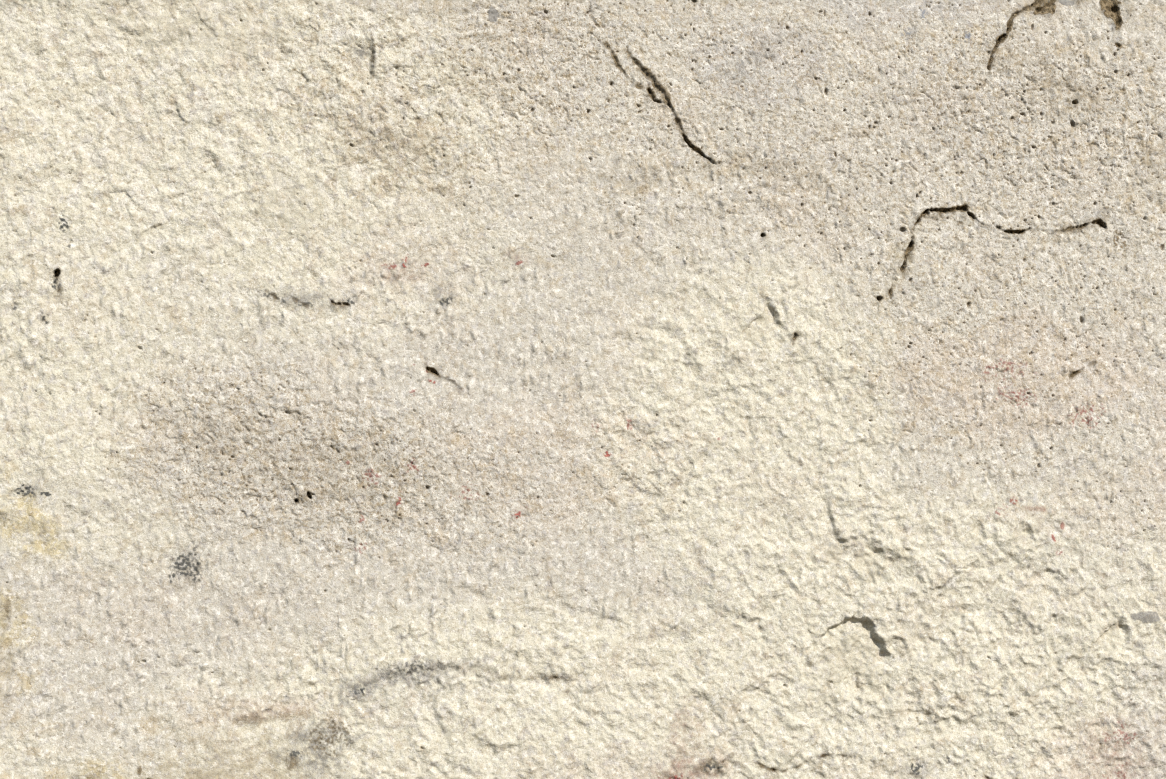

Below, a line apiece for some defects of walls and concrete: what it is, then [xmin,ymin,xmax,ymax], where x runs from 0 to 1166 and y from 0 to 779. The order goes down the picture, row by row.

crack [987,0,1056,70]
crack [1100,0,1123,48]
crack [604,43,709,160]
crack [888,204,1028,296]
crack [1066,218,1106,231]